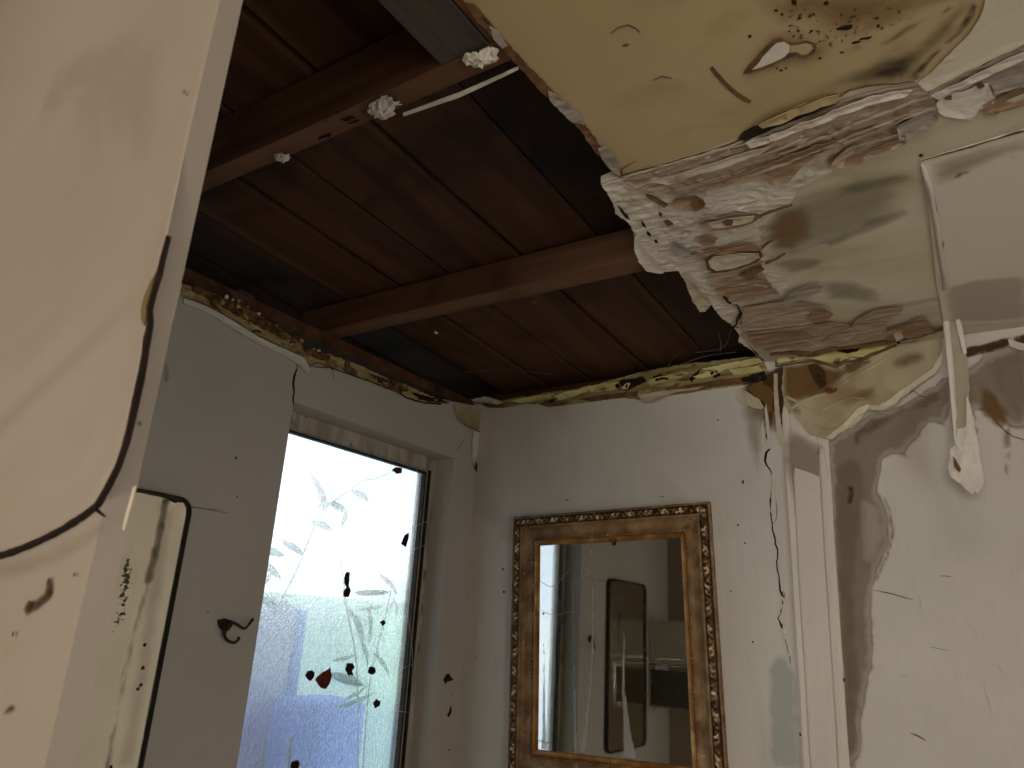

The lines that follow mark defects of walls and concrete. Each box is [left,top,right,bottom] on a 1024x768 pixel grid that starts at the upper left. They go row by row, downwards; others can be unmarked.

leakage [774,0,910,60]
leakage [875,53,936,76]
crack [291,364,299,406]
flaking render [180,193,984,494]
leakage [966,335,1024,444]
peeling [1008,339,1024,351]
crack [760,403,794,664]
leakage [833,383,949,755]